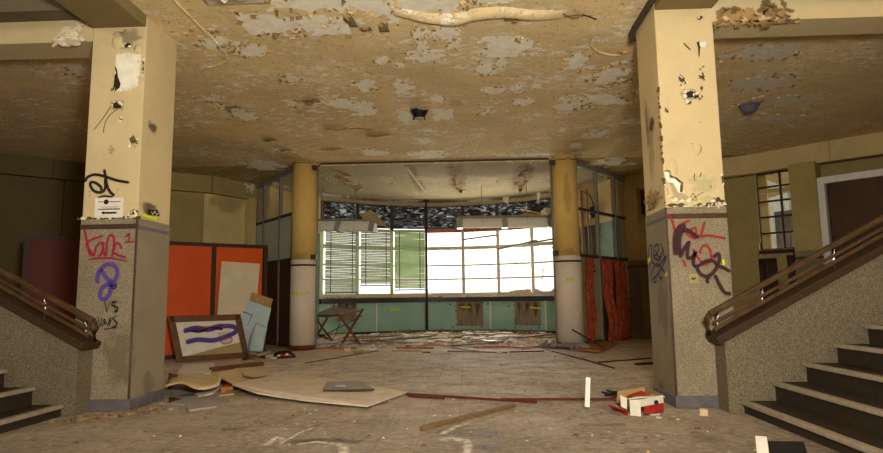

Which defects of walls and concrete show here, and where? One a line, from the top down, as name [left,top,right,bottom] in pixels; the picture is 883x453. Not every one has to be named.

peeling [51,23,86,48]
peeling [712,0,801,30]
flaking render [110,42,145,122]
peeling [182,0,514,171]
peeling [473,36,543,116]
peeling [550,50,639,113]
flaking render [679,41,708,105]
peeling [717,41,833,108]
flaking render [643,87,728,212]